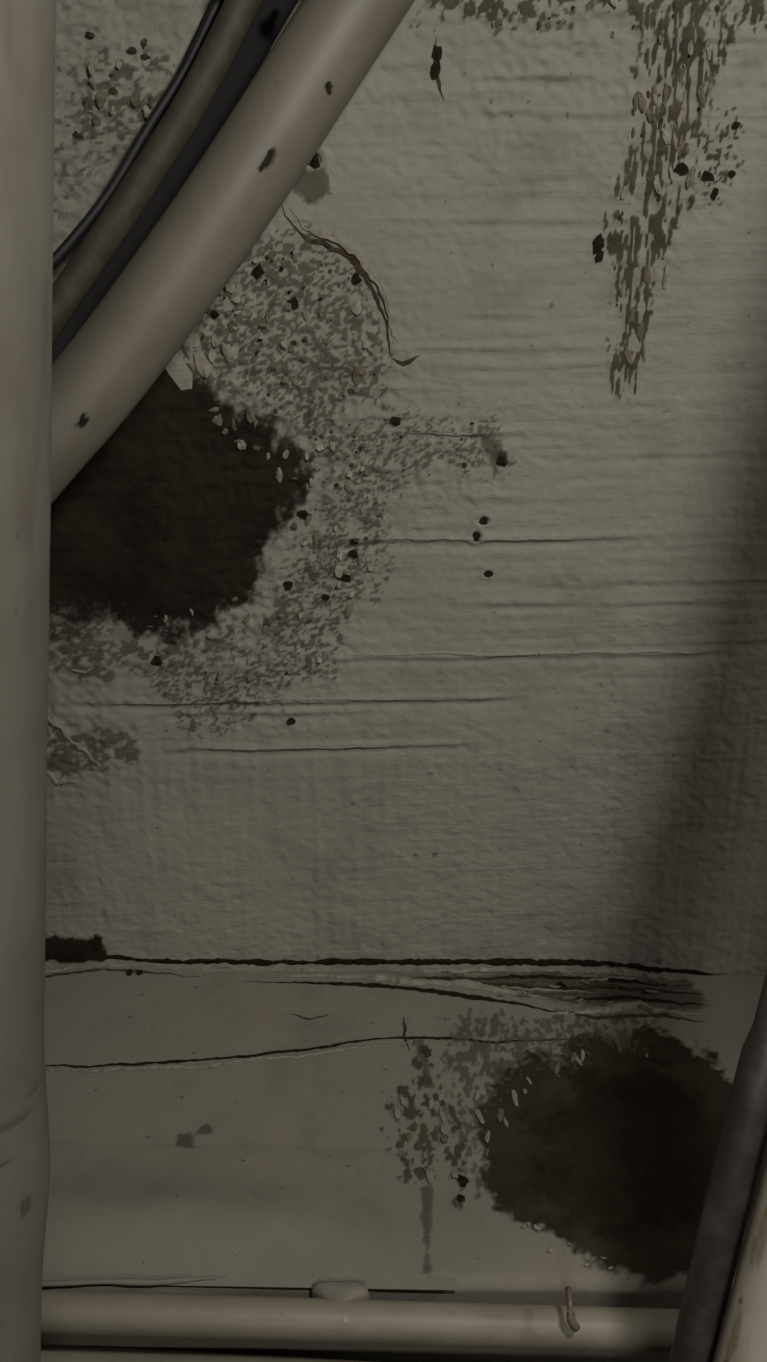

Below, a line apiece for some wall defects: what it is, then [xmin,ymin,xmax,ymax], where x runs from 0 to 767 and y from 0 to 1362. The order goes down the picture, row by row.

crack [282,205,420,366]
leakage [431,0,767,398]
leakage [49,368,316,671]
crack [45,955,715,1072]
leakage [441,1008,732,1283]